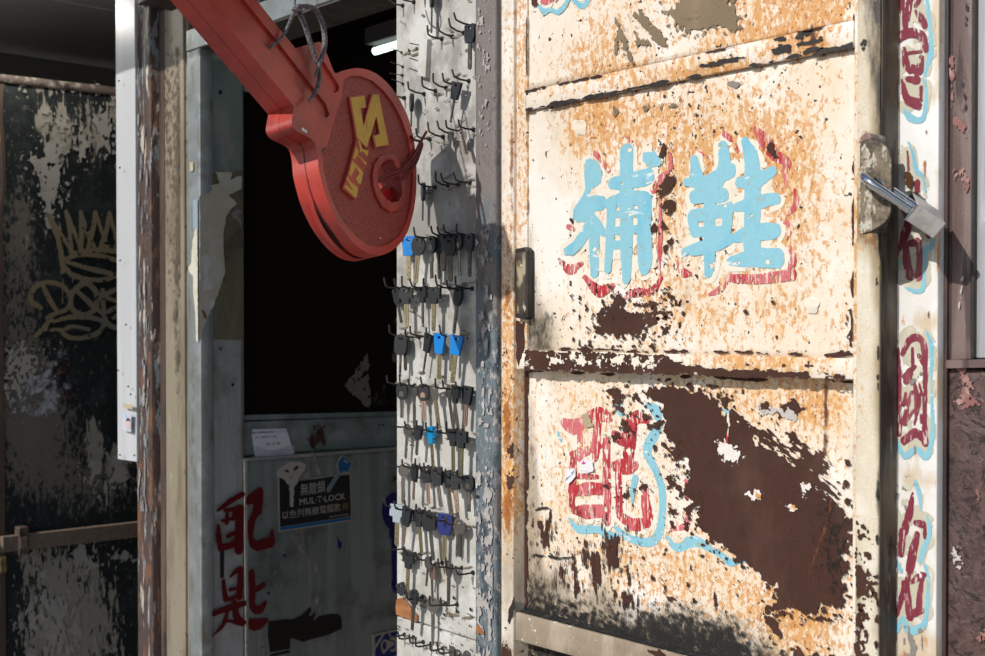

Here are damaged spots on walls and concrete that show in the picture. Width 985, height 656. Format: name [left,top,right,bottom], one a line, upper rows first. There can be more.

peeling [16,83,116,239]
peeling [4,340,66,424]
peeling [10,541,136,656]
peeling [72,358,148,512]
peeling [138,258,149,346]
peeling [468,224,492,428]
peeling [475,466,493,656]
corrosion [502,475,514,533]
corrosion [503,397,514,458]
peeling [516,283,879,656]
corrosion [823,379,853,455]
peeling [953,368,983,410]